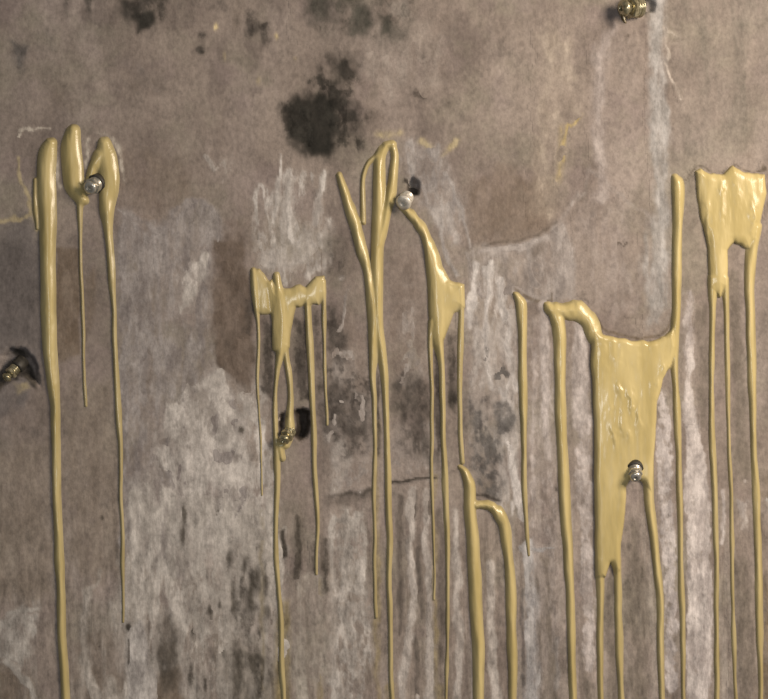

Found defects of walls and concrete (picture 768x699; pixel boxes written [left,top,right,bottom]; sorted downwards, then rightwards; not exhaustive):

leakage [278,0,768,699]
crack [320,465,459,510]
crack [476,492,503,504]